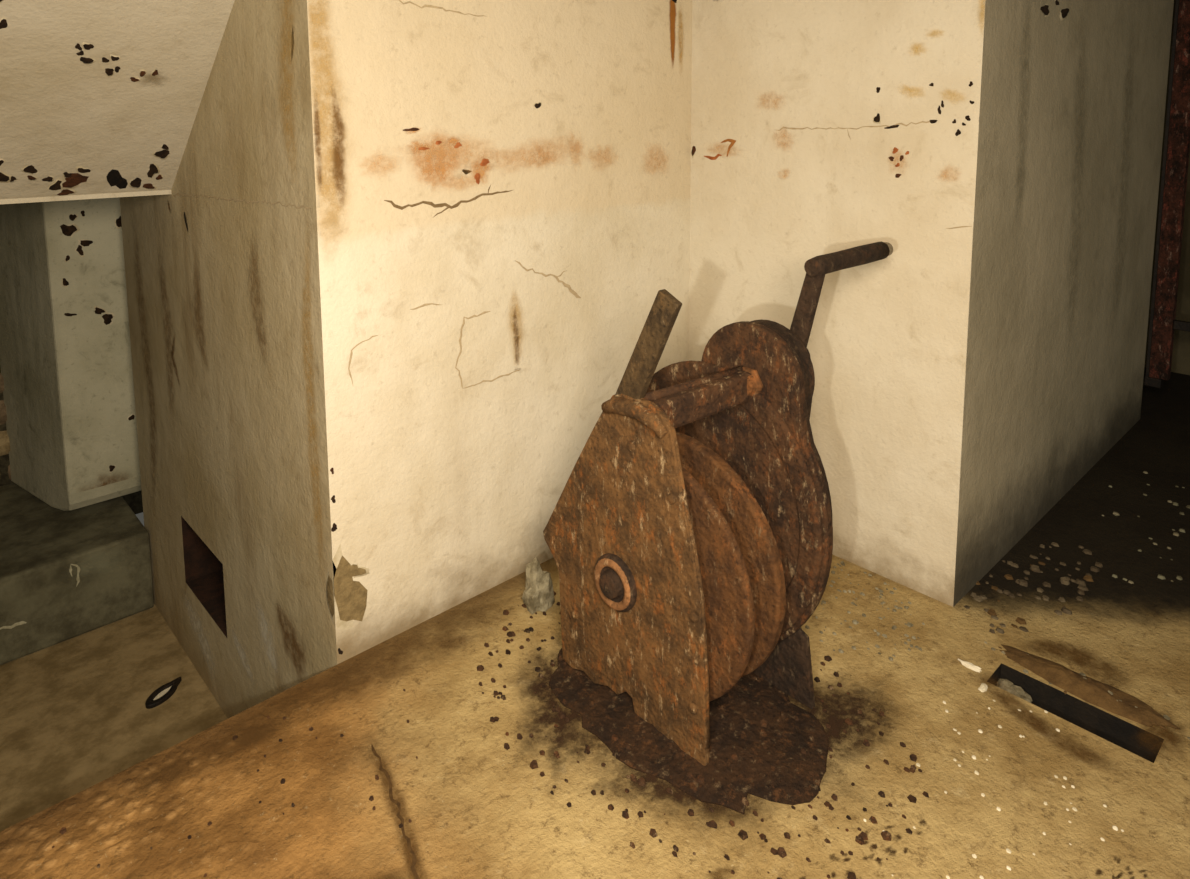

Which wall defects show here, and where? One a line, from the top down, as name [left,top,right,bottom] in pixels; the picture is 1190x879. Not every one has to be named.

rust [670,0,682,62]
peeling [75,42,158,82]
water stain [313,39,343,194]
peeling [0,159,91,196]
peeling [106,144,169,189]
rust [403,128,462,179]
crack [384,185,512,217]
rust [474,158,490,185]
crack [516,261,581,298]
crack [410,303,520,389]
spalling [326,545,370,630]
crack [372,745,423,879]